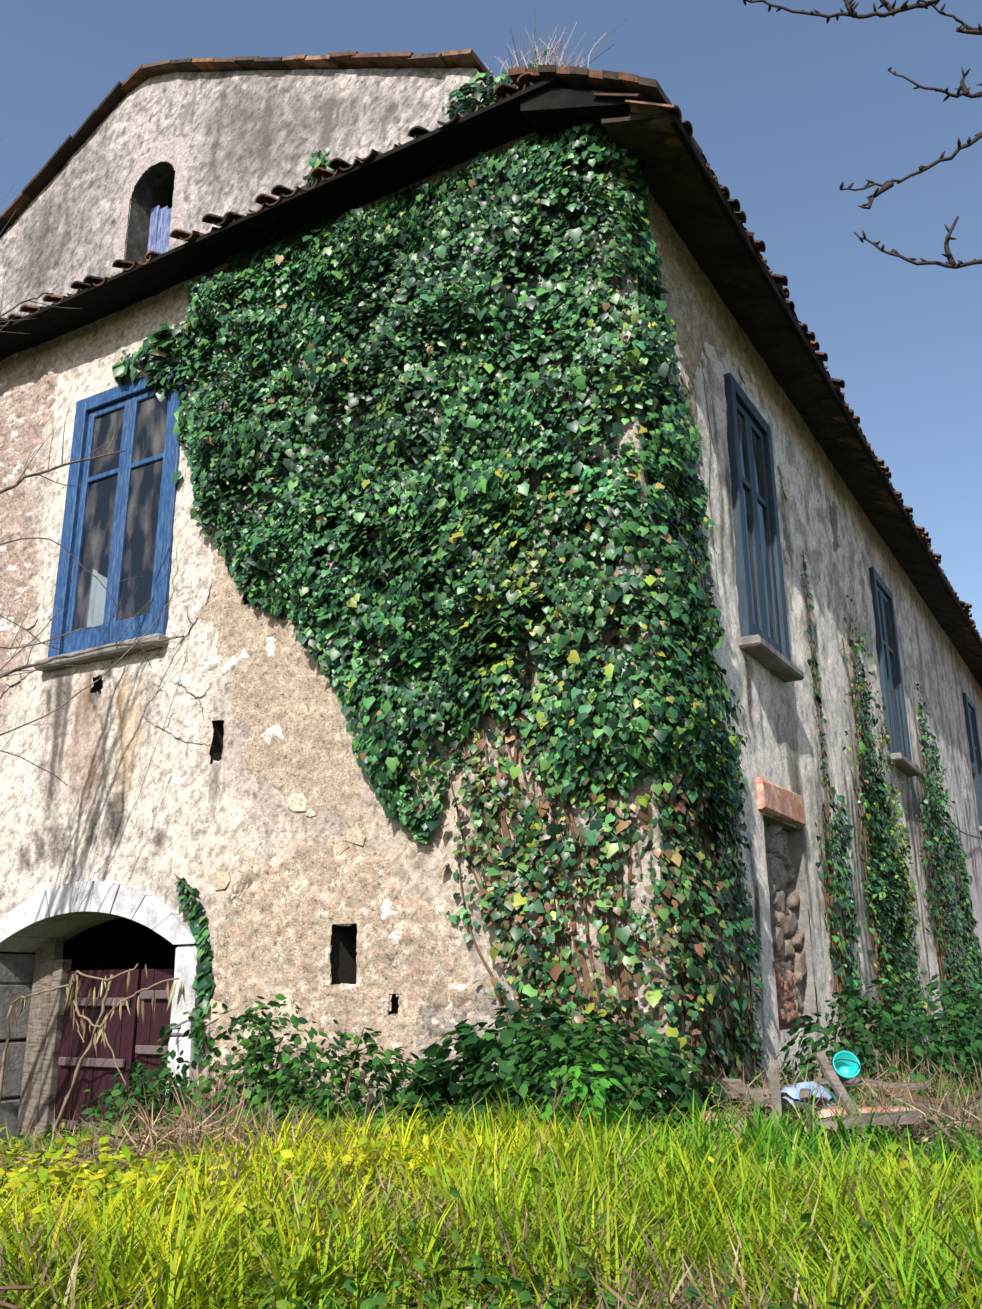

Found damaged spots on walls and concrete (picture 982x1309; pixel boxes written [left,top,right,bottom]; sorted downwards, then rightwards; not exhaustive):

leakage [47,677,71,808]
flaking render [764,822,807,1030]
flaking render [828,927,870,1050]